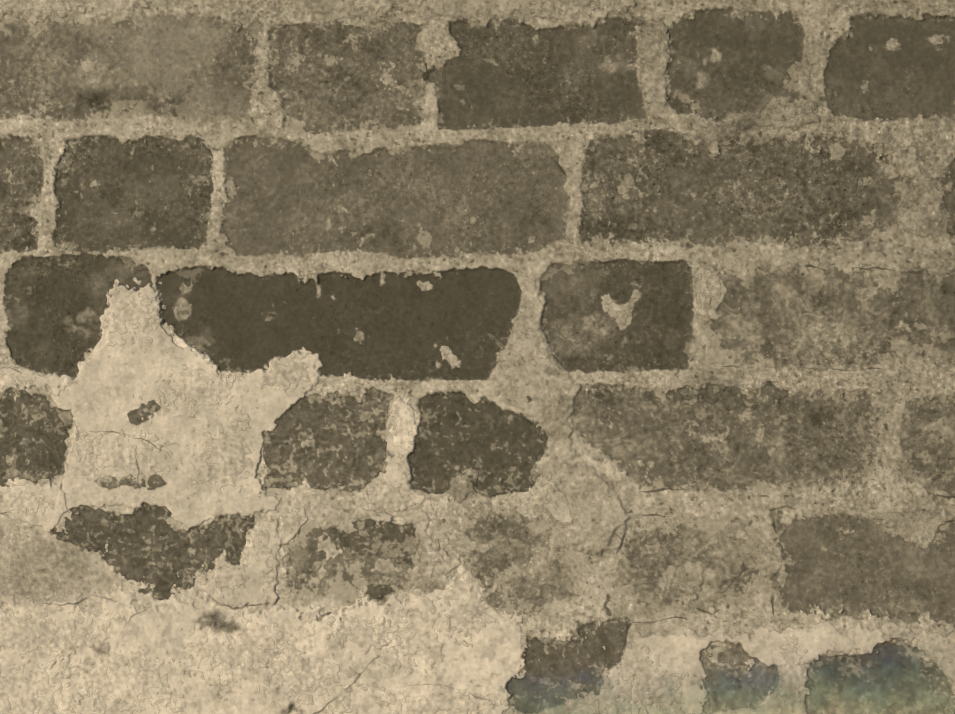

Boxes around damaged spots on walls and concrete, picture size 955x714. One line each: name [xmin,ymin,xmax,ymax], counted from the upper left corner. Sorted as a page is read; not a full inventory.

peeling [0,277,955,714]